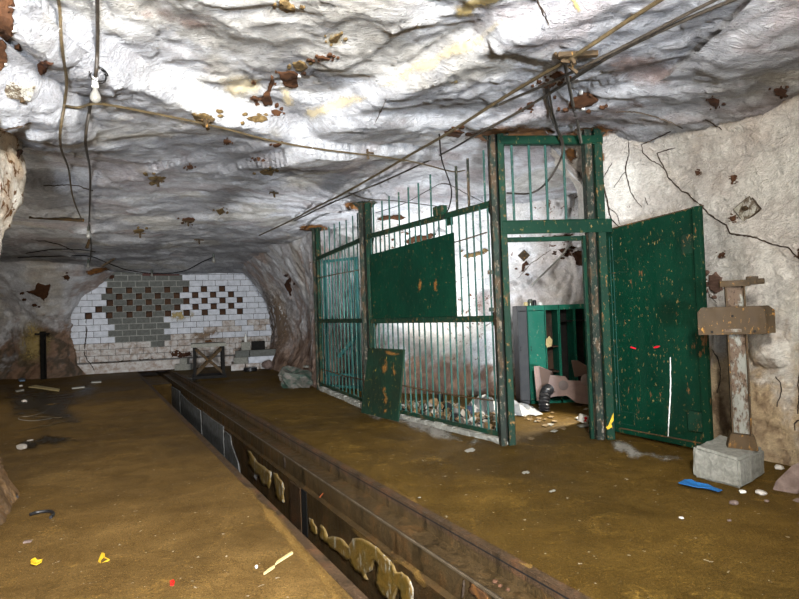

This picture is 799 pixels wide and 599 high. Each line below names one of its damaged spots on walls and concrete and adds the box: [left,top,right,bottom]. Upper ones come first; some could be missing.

peeling [0,0,21,71]
peeling [240,31,348,125]
peeling [143,172,166,186]
crack [604,111,799,259]
peeling [19,283,51,308]
crack [775,374,799,430]